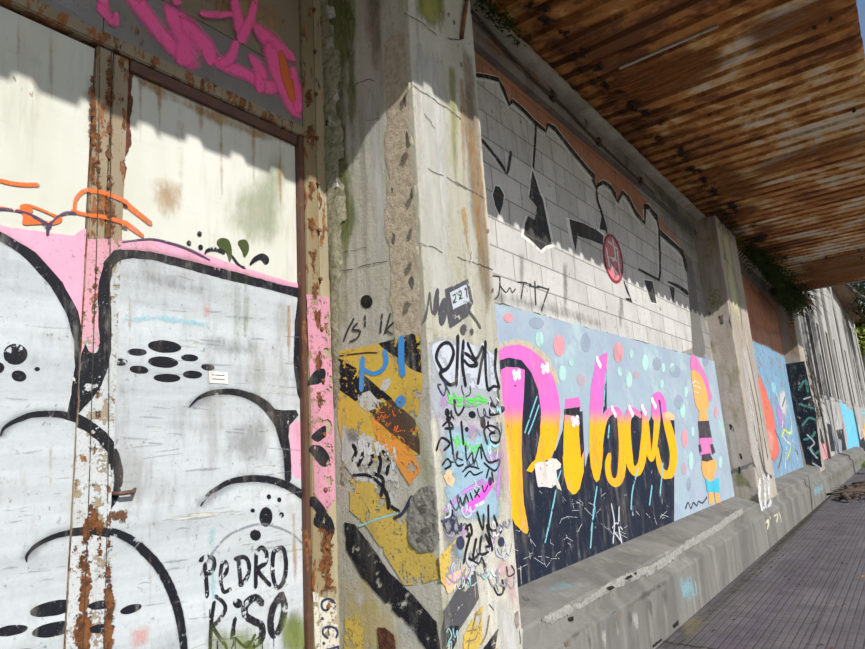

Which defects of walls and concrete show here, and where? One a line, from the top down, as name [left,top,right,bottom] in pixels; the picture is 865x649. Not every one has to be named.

corrosion [745,0,837,53]
corrosion [88,57,113,244]
corrosion [757,136,864,175]
spalling [320,0,347,414]
corrosion [800,250,865,289]
corrosion [74,504,128,649]
corrosion [318,525,337,596]